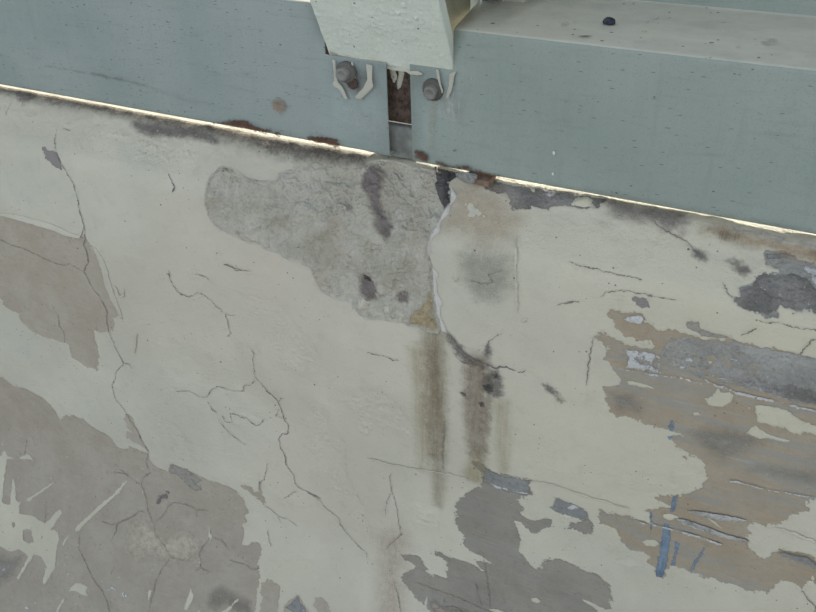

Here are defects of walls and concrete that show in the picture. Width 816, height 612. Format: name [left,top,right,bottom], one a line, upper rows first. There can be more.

peeling [0,213,122,371]
crack [1,128,209,609]
peeling [0,377,331,612]
crack [168,269,233,332]
crack [177,350,368,560]
spalling [204,160,459,335]
damp [446,336,490,364]
damp [485,371,501,397]
peeling [401,296,816,612]
peeling [733,250,816,319]